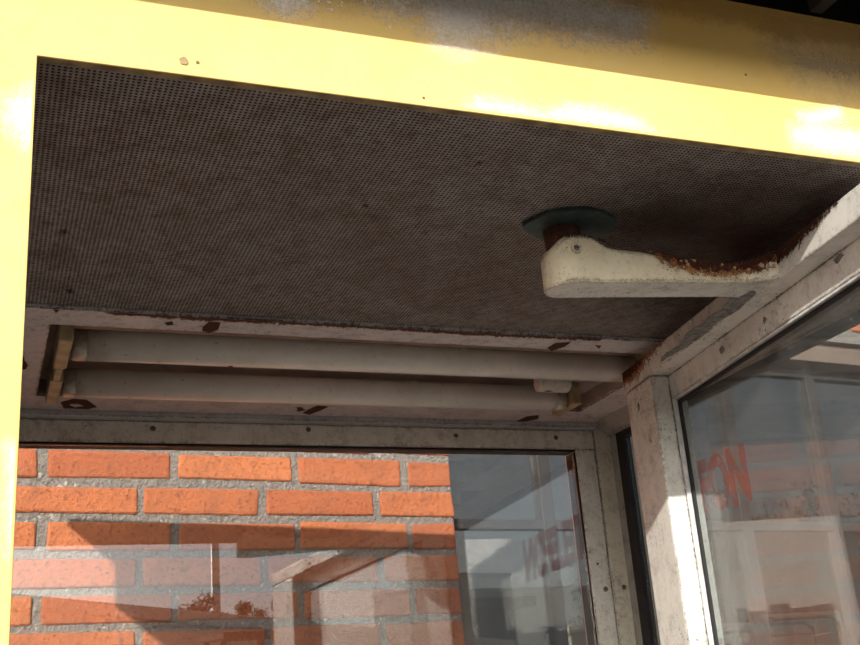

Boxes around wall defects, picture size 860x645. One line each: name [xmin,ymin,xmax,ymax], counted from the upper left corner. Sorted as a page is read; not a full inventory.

corrosion [561,182,847,279]
corrosion [104,312,602,341]
corrosion [622,334,674,389]
peeling [660,290,756,363]